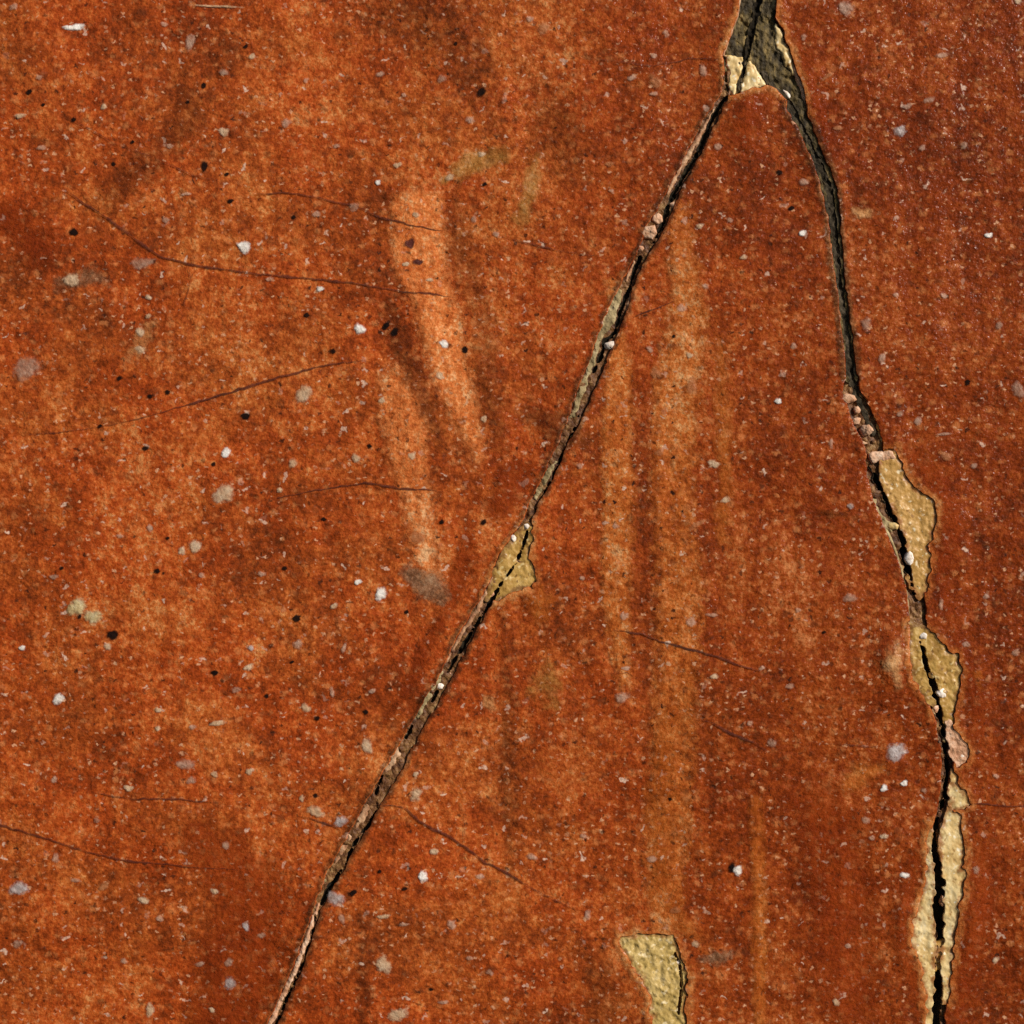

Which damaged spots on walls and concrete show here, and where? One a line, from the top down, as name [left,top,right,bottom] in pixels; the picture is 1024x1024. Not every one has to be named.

rust [401,521,473,696]
flaking render [480,520,540,607]
crack [265,0,1024,1024]
flaking render [878,443,942,602]
rust [181,823,285,1024]
flaking render [614,926,695,1024]
rust [750,796,768,1024]
rust [788,763,885,1021]
rust [895,851,917,990]
flaking render [902,617,977,1024]